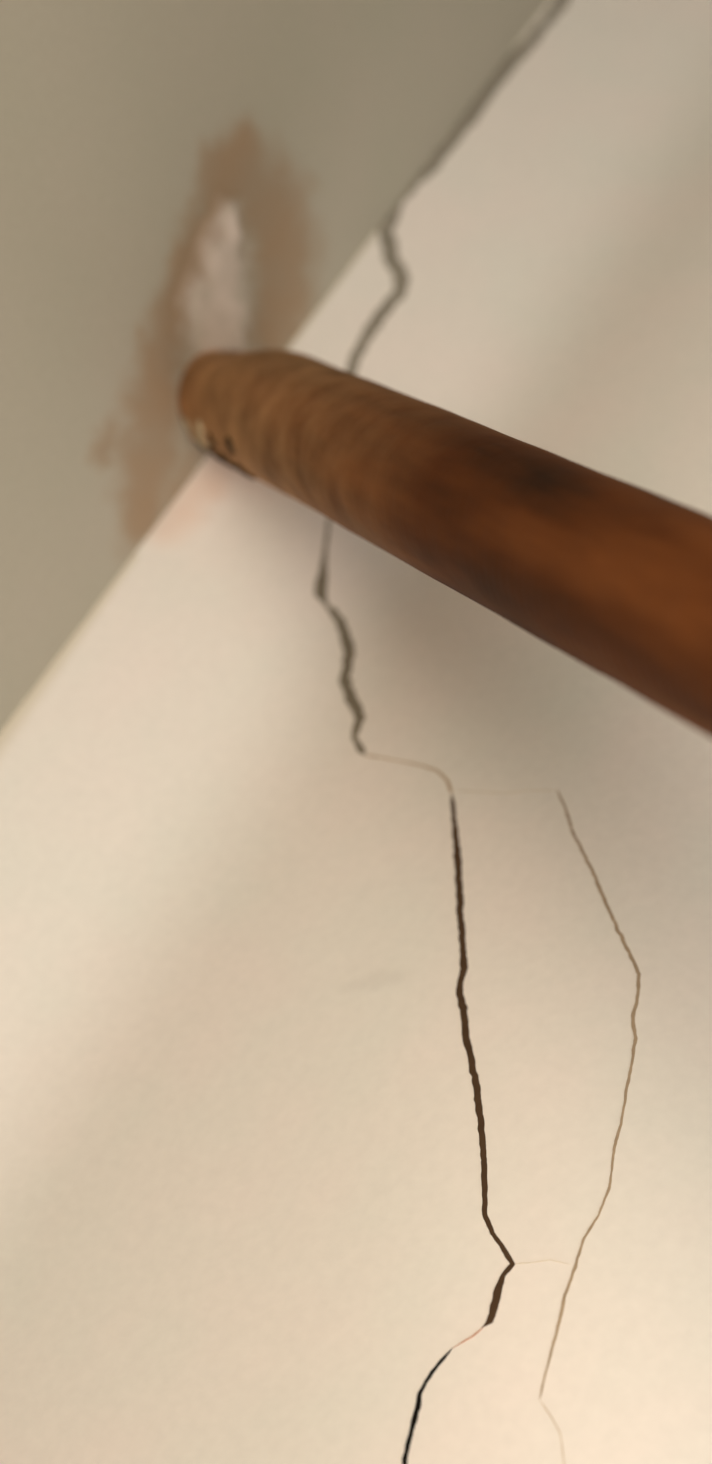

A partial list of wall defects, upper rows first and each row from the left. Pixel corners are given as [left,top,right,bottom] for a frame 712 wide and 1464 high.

crack [346,0,569,375]
damp [136,454,246,562]
crack [314,518,641,1464]